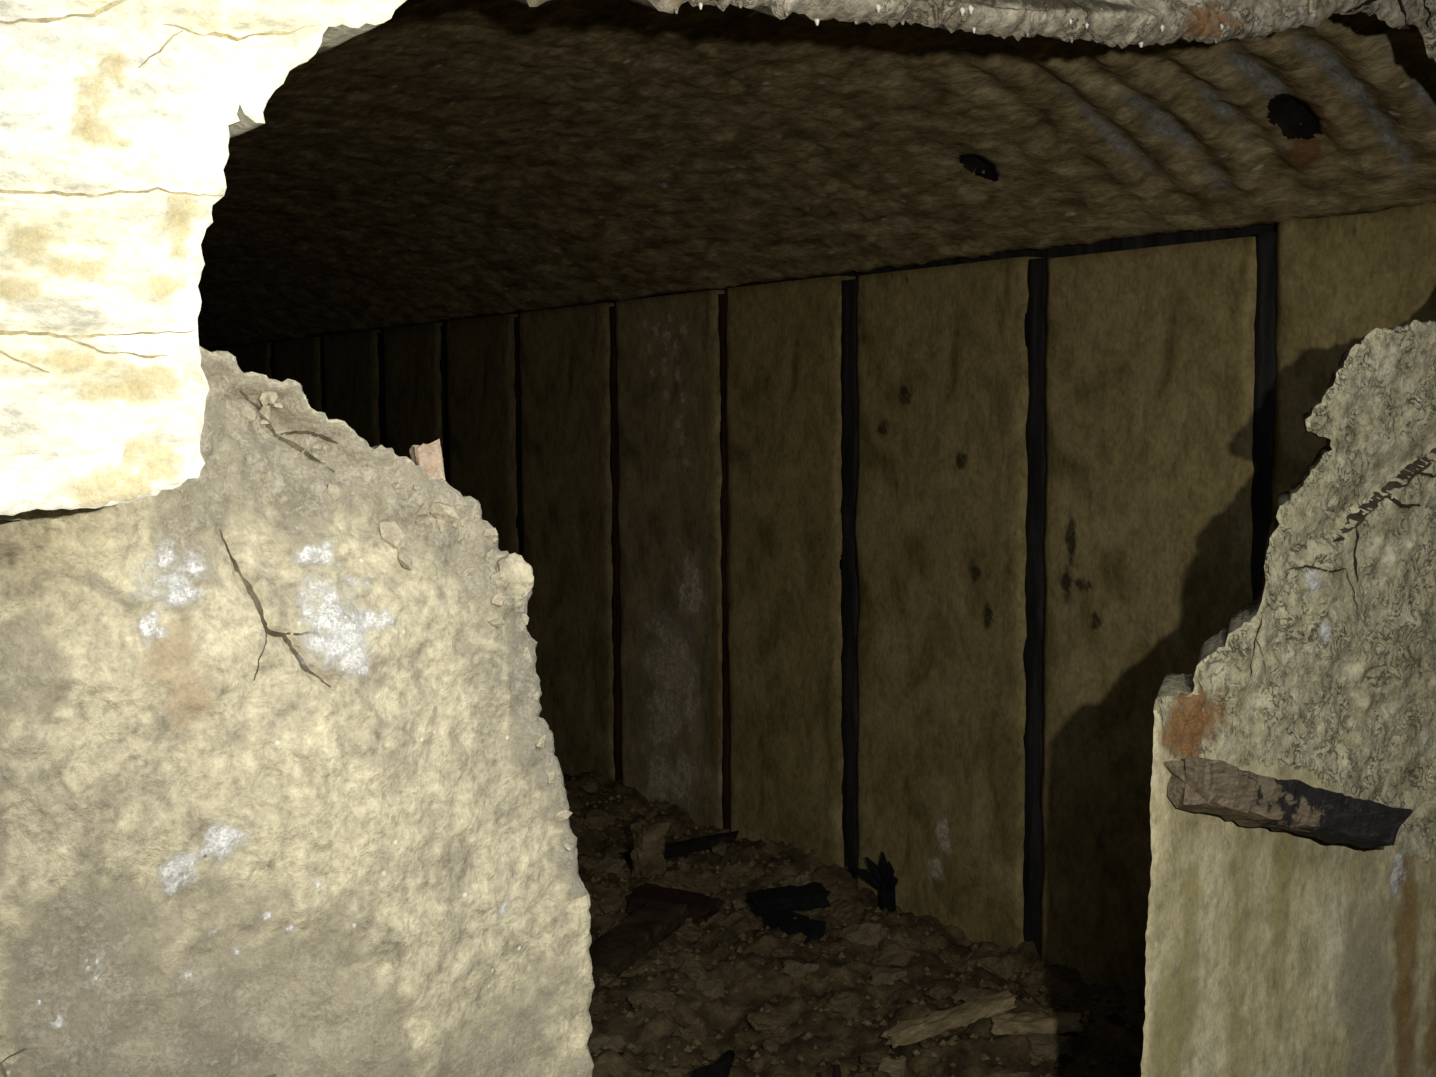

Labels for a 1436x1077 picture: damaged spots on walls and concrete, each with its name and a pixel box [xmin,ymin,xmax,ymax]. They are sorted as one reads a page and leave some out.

crack [0,0,127,24]
crack [138,24,314,68]
water stain [139,543,204,638]
crack [219,529,331,687]
water stain [297,541,394,674]
spalling [158,351,588,898]
spalling [1160,321,1436,862]
crack [1288,448,1436,615]
corrosion [1162,688,1223,758]
water stain [11,823,403,1077]
water stain [441,978,562,1077]
corrosion [1394,855,1436,1077]